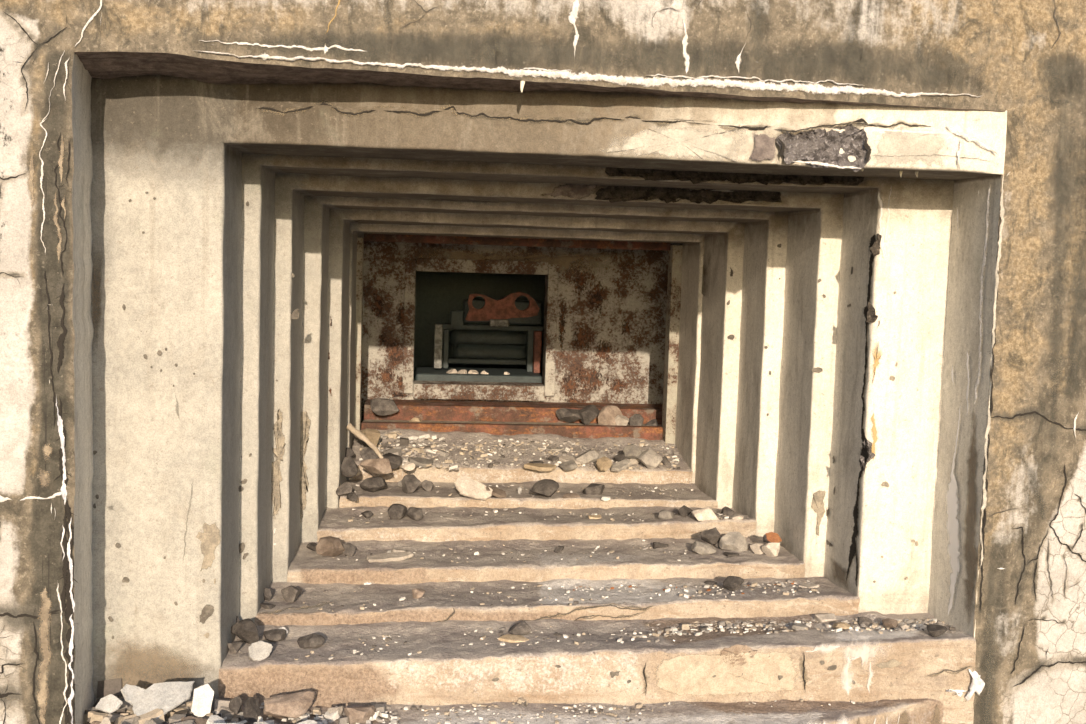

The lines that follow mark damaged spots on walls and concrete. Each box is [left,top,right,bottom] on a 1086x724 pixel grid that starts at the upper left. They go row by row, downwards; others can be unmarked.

crack [3,11,70,108]
crack [257,101,931,135]
spalling [542,124,944,204]
crack [0,132,78,724]
rust [376,334,407,398]
rust [558,266,626,403]
crack [846,234,875,587]
leakage [946,187,990,615]
crack [975,208,1086,687]
leakage [946,669,985,701]